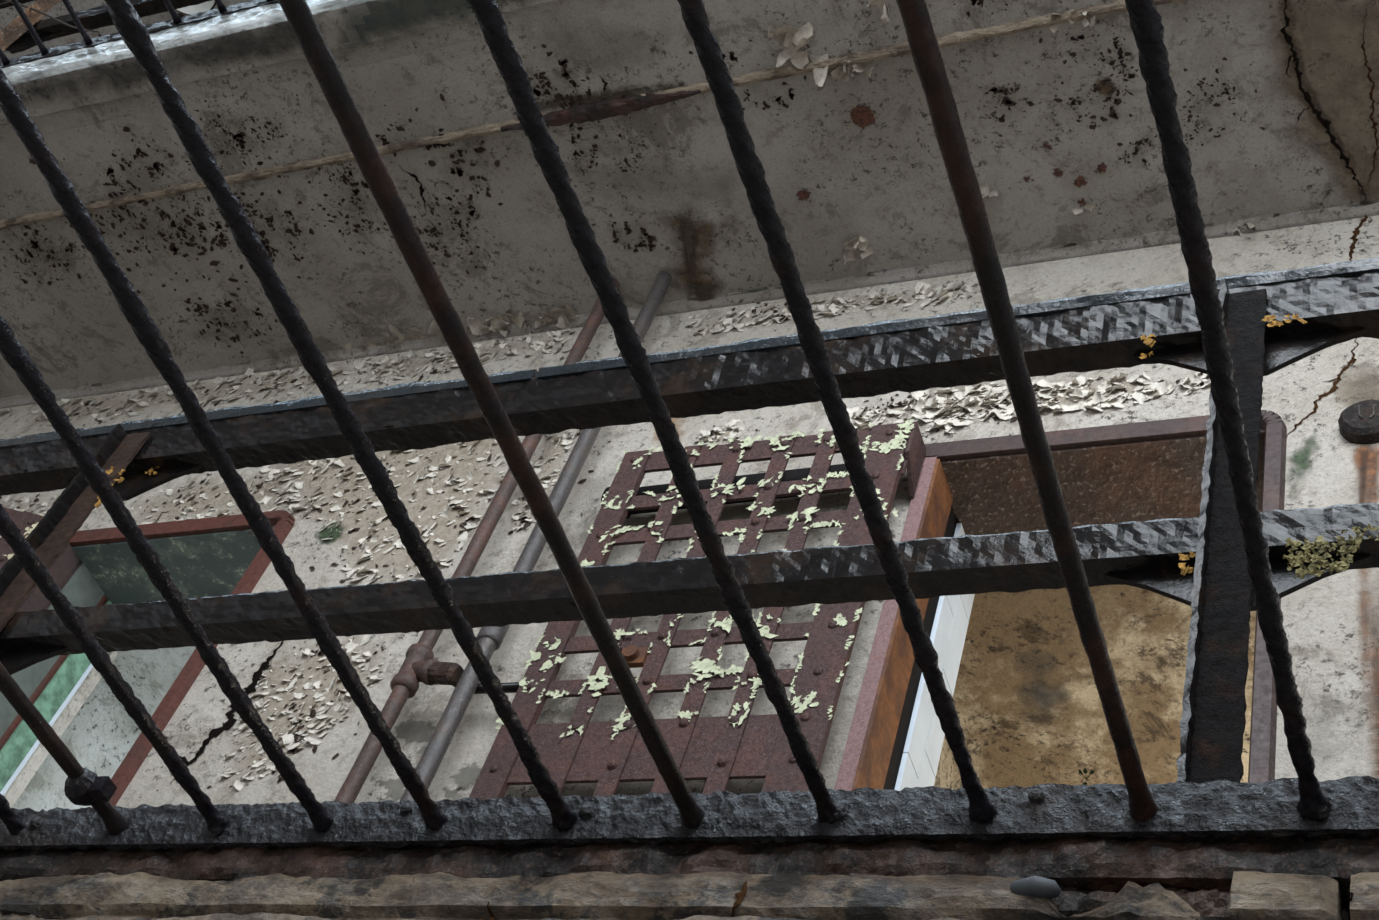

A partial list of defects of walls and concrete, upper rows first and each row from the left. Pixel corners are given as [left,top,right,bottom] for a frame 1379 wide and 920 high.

crack [1280,0,1379,261]
water stain [671,211,719,301]
crack [1286,338,1359,438]
peeling [580,474,683,567]
peeling [684,419,862,553]
rust [1355,446,1379,504]
rust [1361,595,1369,632]
crack [179,641,283,766]
peeling [519,631,618,737]
peeling [676,611,762,726]
rust [1363,651,1379,778]
crack [1342,888,1354,920]